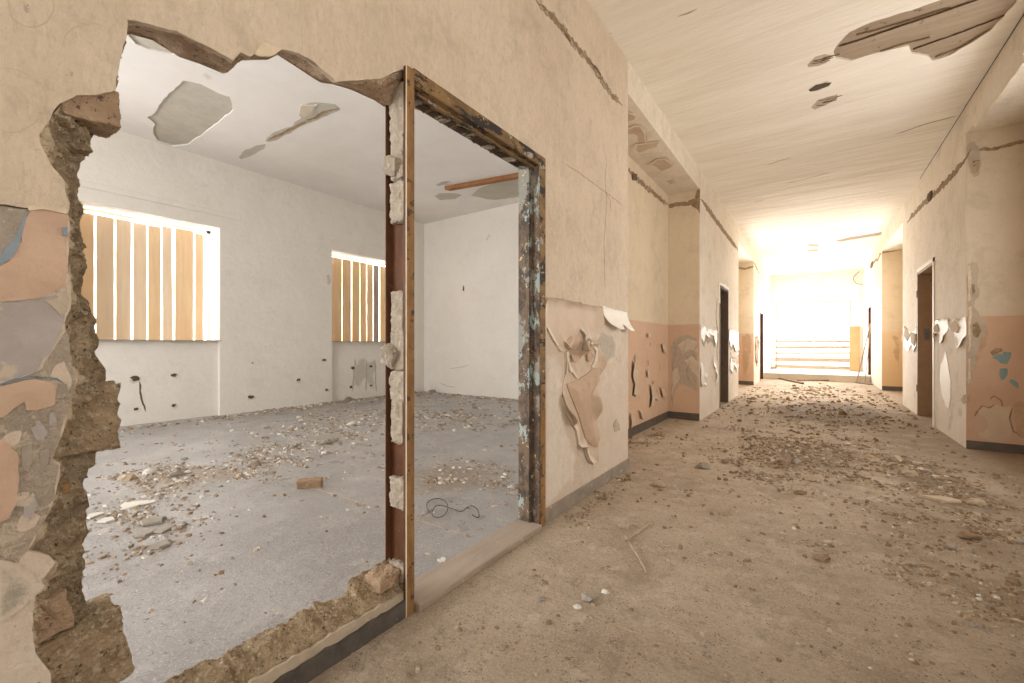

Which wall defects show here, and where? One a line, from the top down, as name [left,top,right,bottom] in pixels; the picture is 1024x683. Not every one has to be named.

flaking render [149,81,233,145]
spalling [121,22,403,105]
spalling [239,102,340,159]
crack [536,0,622,105]
crack [563,146,759,273]
flaking render [807,0,1016,67]
crack [907,140,1024,222]
spalling [0,75,145,683]
peeling [546,298,667,465]
peeling [701,324,740,387]
flaking render [933,262,1003,409]
spalling [163,557,406,683]